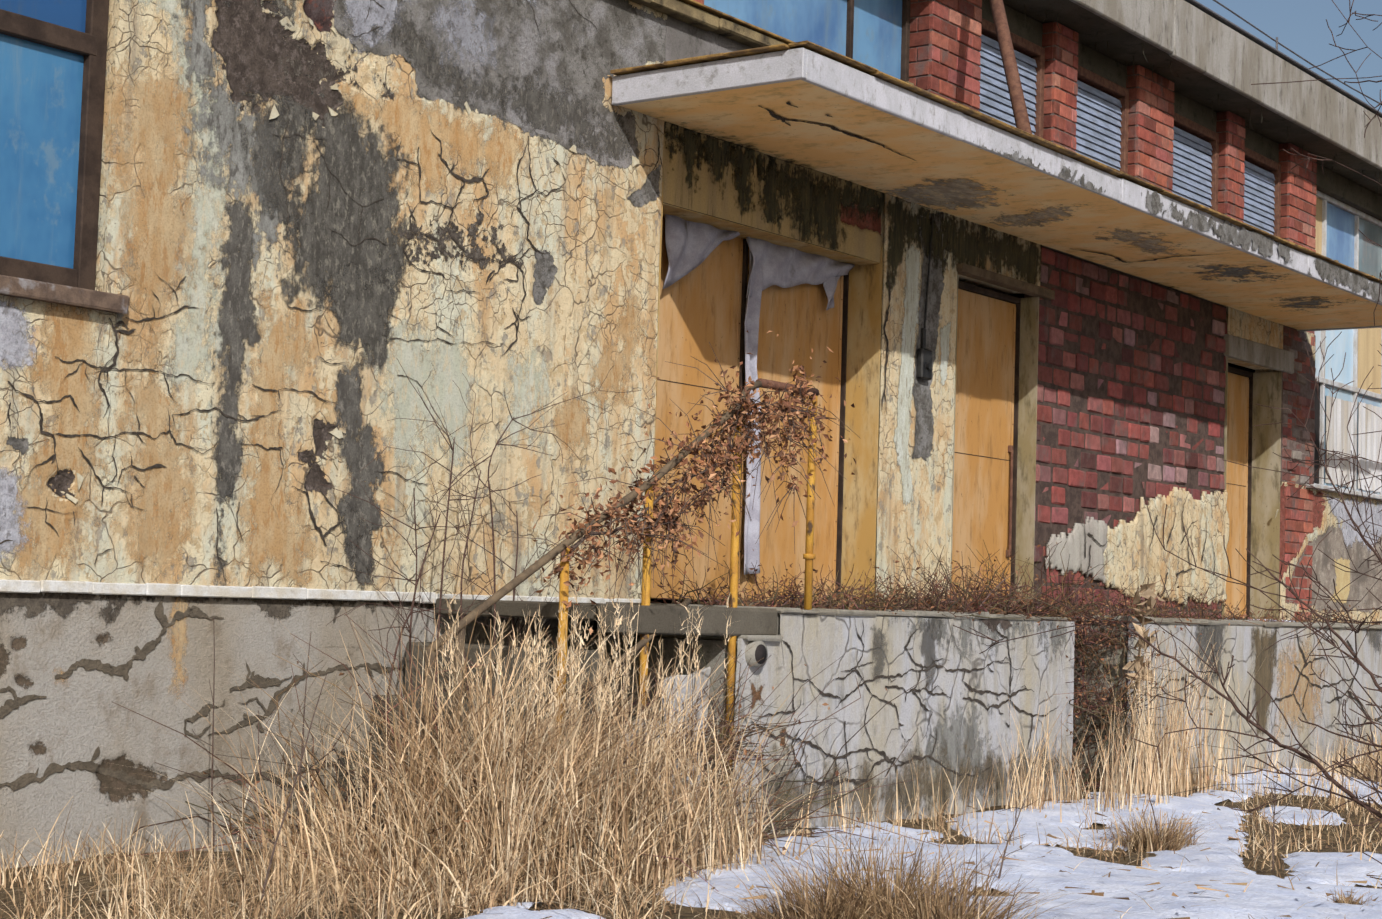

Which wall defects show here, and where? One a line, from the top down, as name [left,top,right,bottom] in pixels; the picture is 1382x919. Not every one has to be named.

peeling [211,0,667,207]
leakage [346,0,632,171]
crack [759,102,916,161]
leakage [0,0,549,625]
crack [272,97,566,355]
flaking render [399,206,557,305]
leakage [659,117,1042,505]
crack [7,276,361,580]
peeling [1044,487,1229,607]
peeling [1275,482,1382,614]
crack [752,618,1056,794]
leakage [1251,628,1277,735]